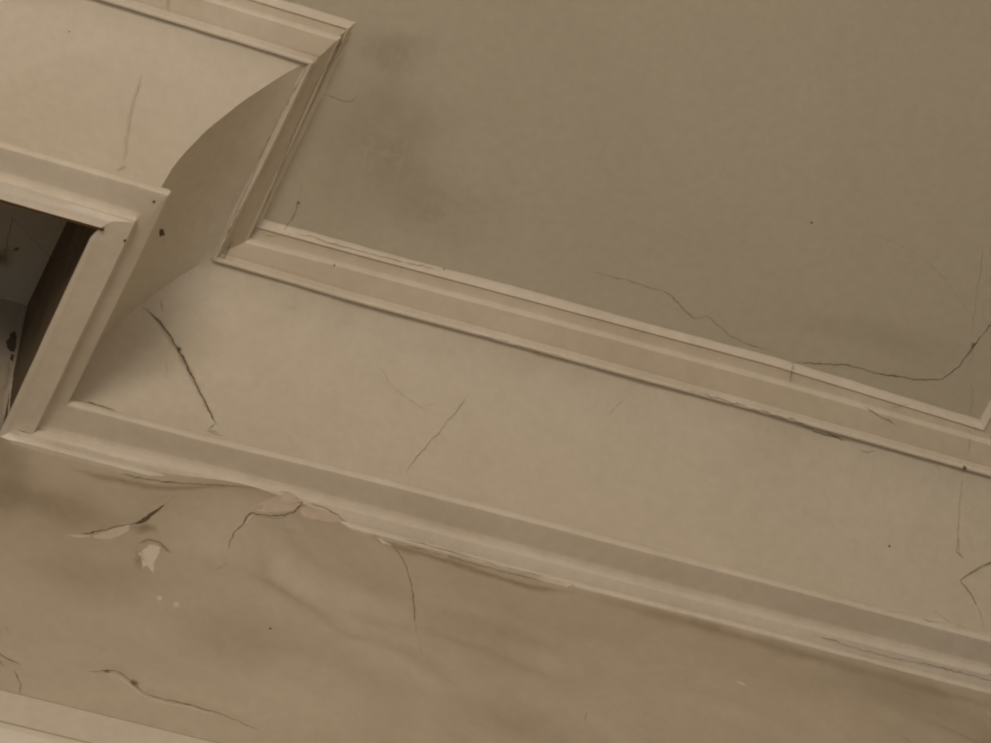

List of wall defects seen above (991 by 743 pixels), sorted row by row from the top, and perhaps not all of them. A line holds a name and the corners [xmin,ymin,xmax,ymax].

spalling [66,504,165,540]
spalling [138,545,160,574]